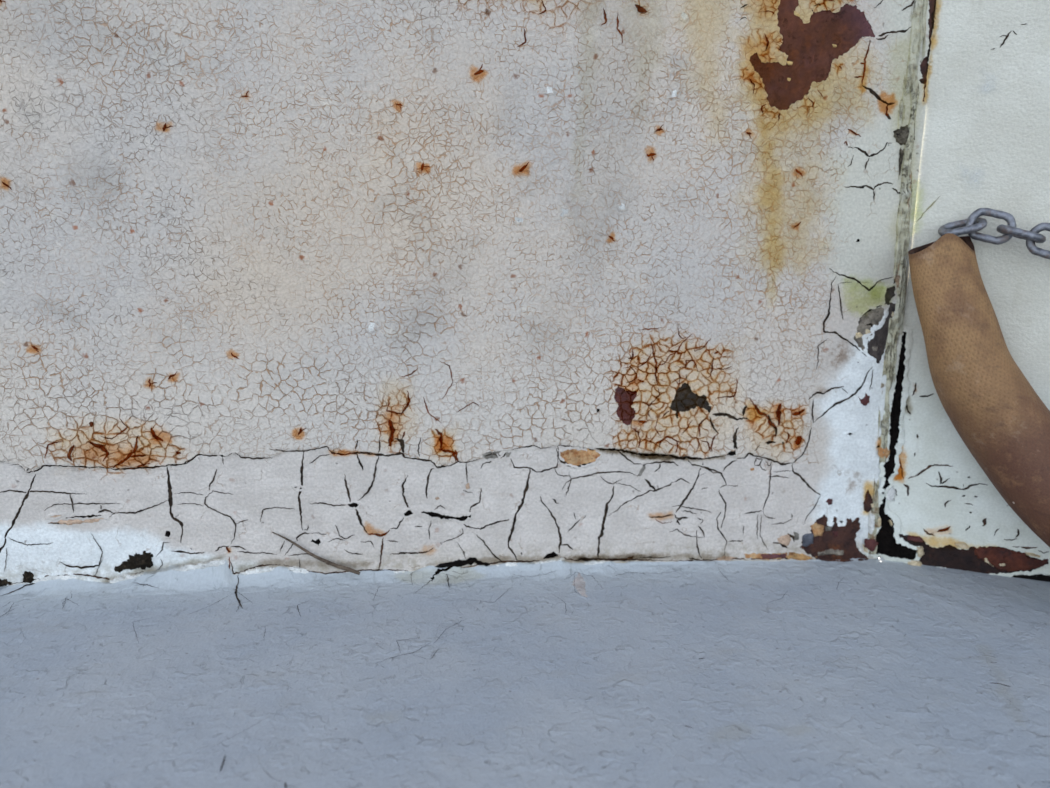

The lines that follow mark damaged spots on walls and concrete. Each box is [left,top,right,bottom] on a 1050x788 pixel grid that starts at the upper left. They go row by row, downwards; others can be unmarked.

corrosion [855,40,895,119]
peeling [850,282,897,369]
corrosion [45,419,182,473]
corrosion [377,391,411,452]
corrosion [424,399,456,462]
crack [0,265,895,617]
corrosion [613,327,738,454]
corrosion [748,399,805,451]
peeling [772,511,872,562]